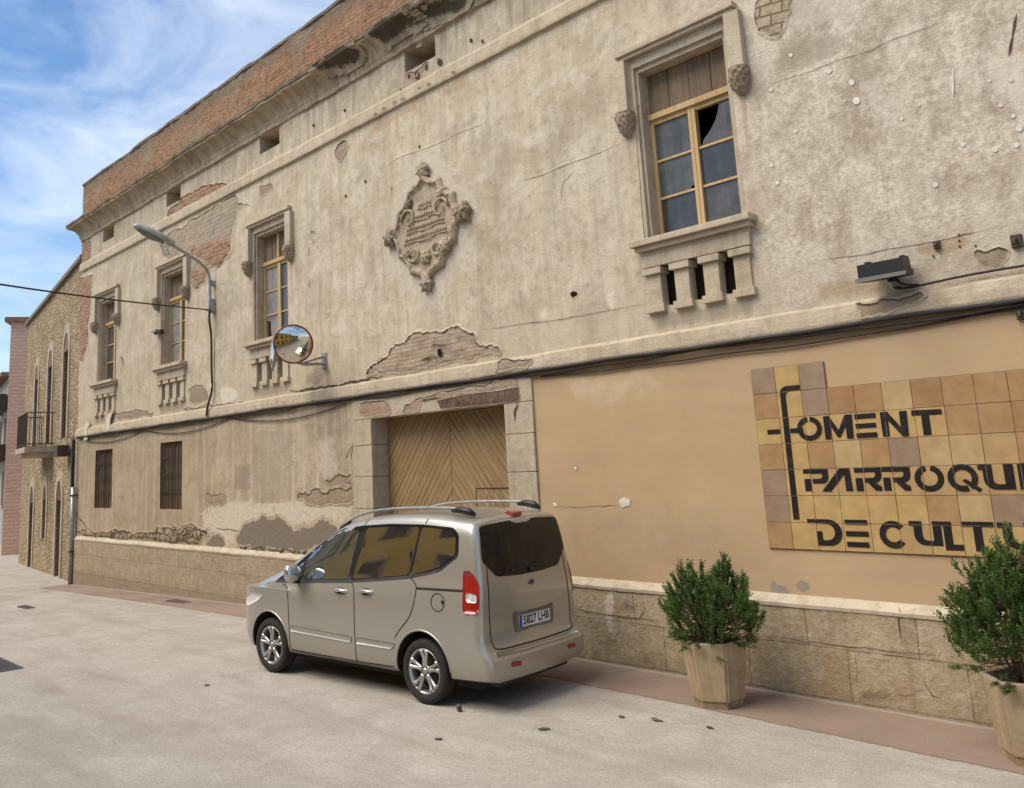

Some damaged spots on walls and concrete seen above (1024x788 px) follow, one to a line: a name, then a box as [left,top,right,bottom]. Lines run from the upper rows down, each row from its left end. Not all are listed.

flaking render [753,0,792,41]
flaking render [334,139,350,163]
flaking render [167,181,242,233]
flaking render [190,228,233,289]
flaking render [972,244,1011,270]
flaking render [855,290,928,319]
flaking render [290,323,533,417]
flaking render [296,471,354,508]